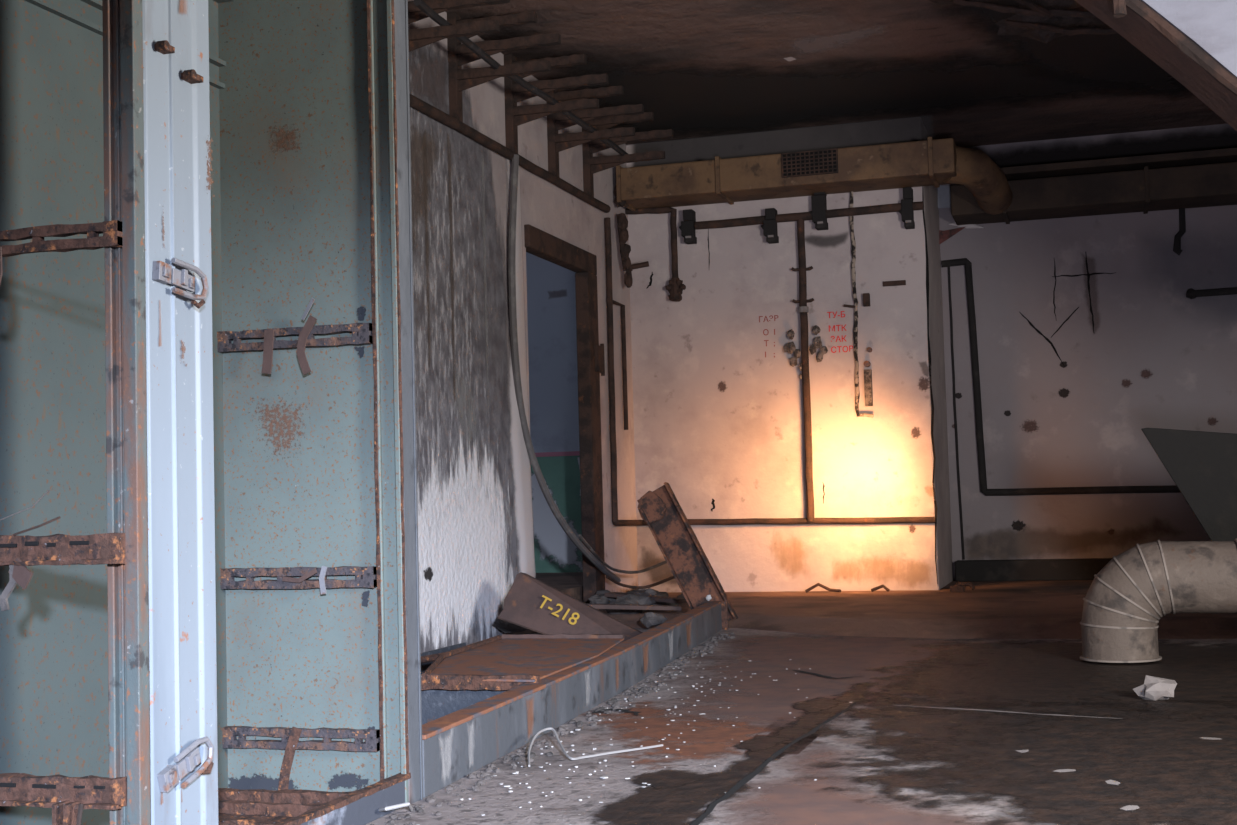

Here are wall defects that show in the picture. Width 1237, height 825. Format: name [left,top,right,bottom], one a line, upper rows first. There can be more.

damp [594,635,1237,825]